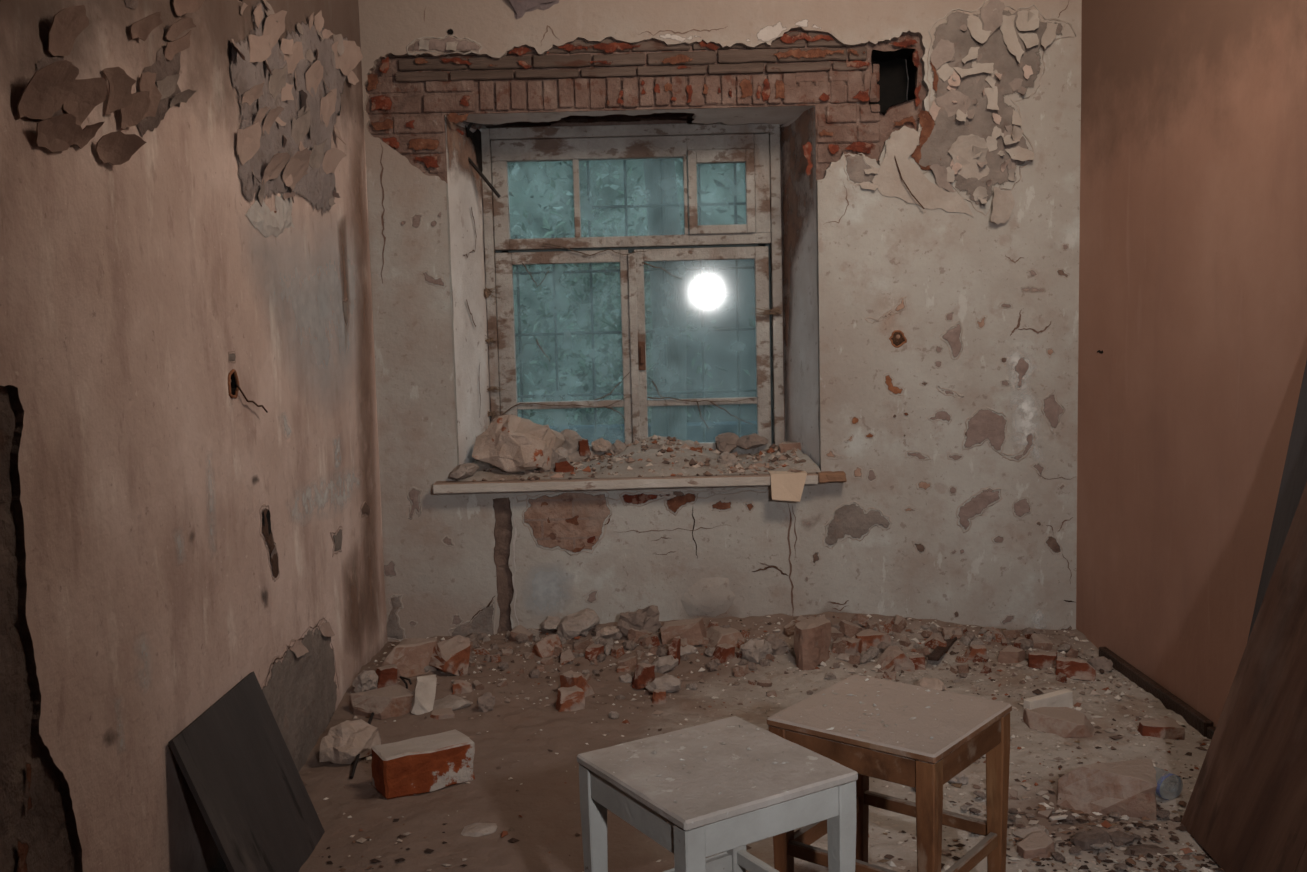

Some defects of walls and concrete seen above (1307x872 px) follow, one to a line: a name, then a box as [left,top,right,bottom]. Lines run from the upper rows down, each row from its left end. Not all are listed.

crack [641,27,726,36]
peeling [17,0,205,165]
flaking render [231,0,1077,371]
peeling [1000,355,1031,390]
peeling [883,372,1066,479]
spalling [259,504,280,582]
flaking render [516,486,769,556]
spalling [804,501,919,582]
peeling [948,486,1073,584]
spalling [261,618,339,772]